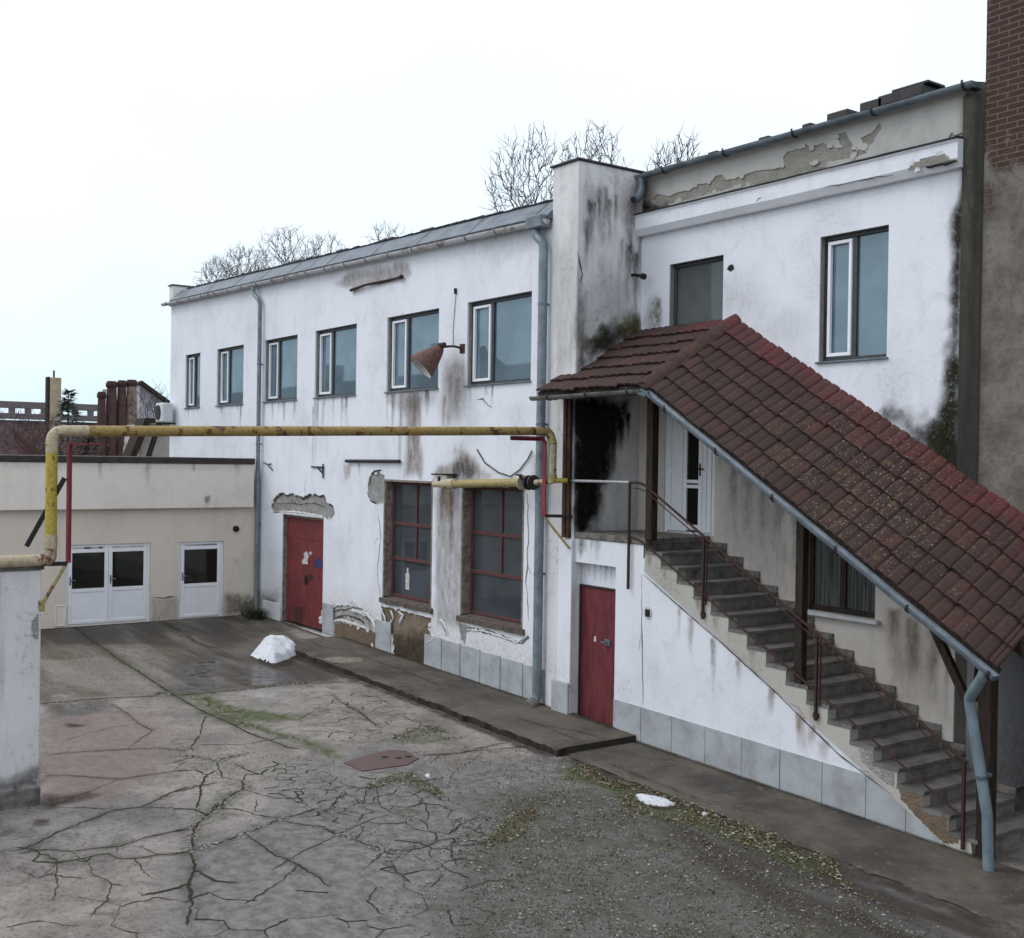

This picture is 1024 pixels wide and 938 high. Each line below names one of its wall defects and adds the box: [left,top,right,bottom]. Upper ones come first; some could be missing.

peeling [653,124,881,205]
spalling [908,150,957,173]
spalling [271,492,334,520]
spalling [368,469,387,504]
damp [400,393,427,470]
damp [571,398,630,532]
damp [907,420,955,464]
spalling [319,600,530,664]
crack [315,689,427,742]
crack [7,762,517,938]